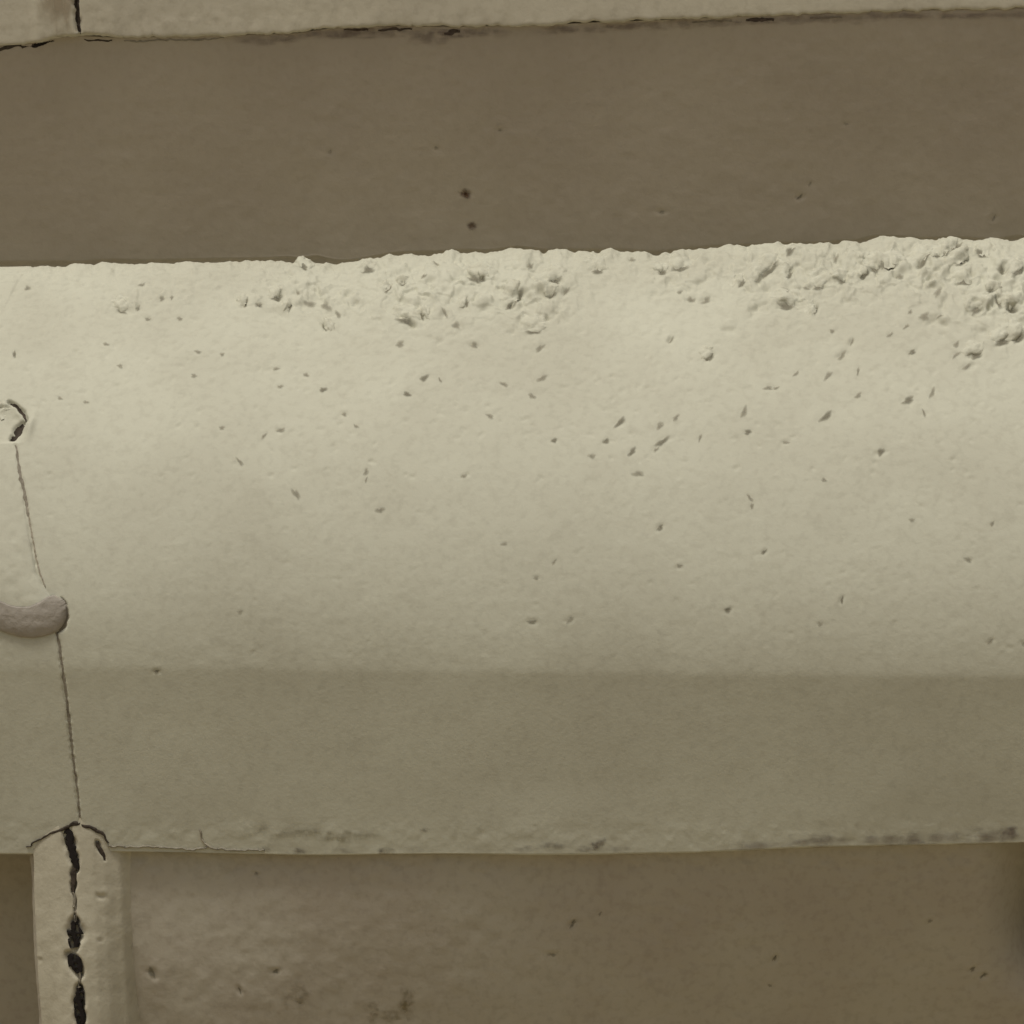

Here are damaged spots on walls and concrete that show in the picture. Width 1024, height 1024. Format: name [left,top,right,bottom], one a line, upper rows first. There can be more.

hole [0,399,27,442]
crack [15,445,46,587]
crack [26,632,109,1024]